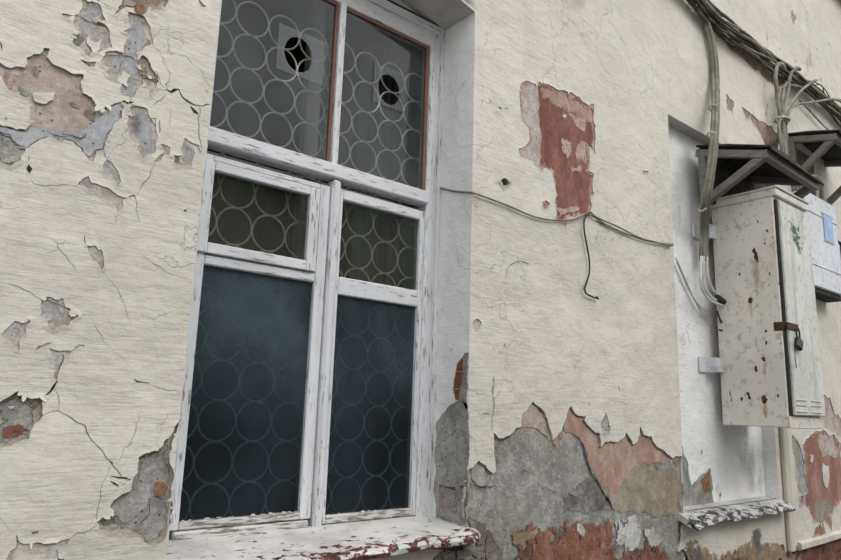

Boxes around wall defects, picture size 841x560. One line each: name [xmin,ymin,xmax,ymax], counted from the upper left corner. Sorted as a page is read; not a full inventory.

spalling [0,0,201,223]
crack [154,71,210,147]
peeling [519,80,596,226]
peeling [2,320,30,351]
peeling [10,284,78,330]
spalling [0,342,181,560]
spalling [433,352,841,560]